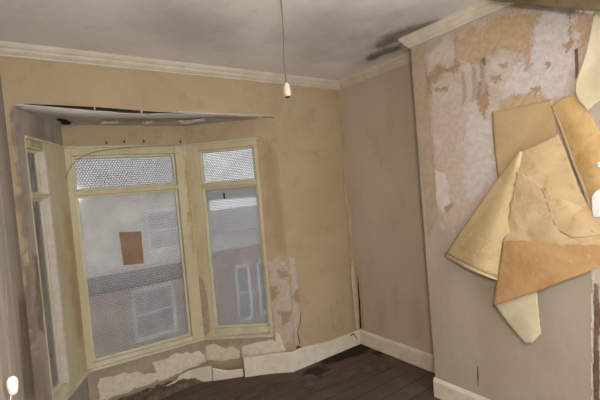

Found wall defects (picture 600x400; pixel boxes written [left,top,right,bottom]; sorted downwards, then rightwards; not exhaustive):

peeling [425,3,593,239]
peeling [98,255,294,400]